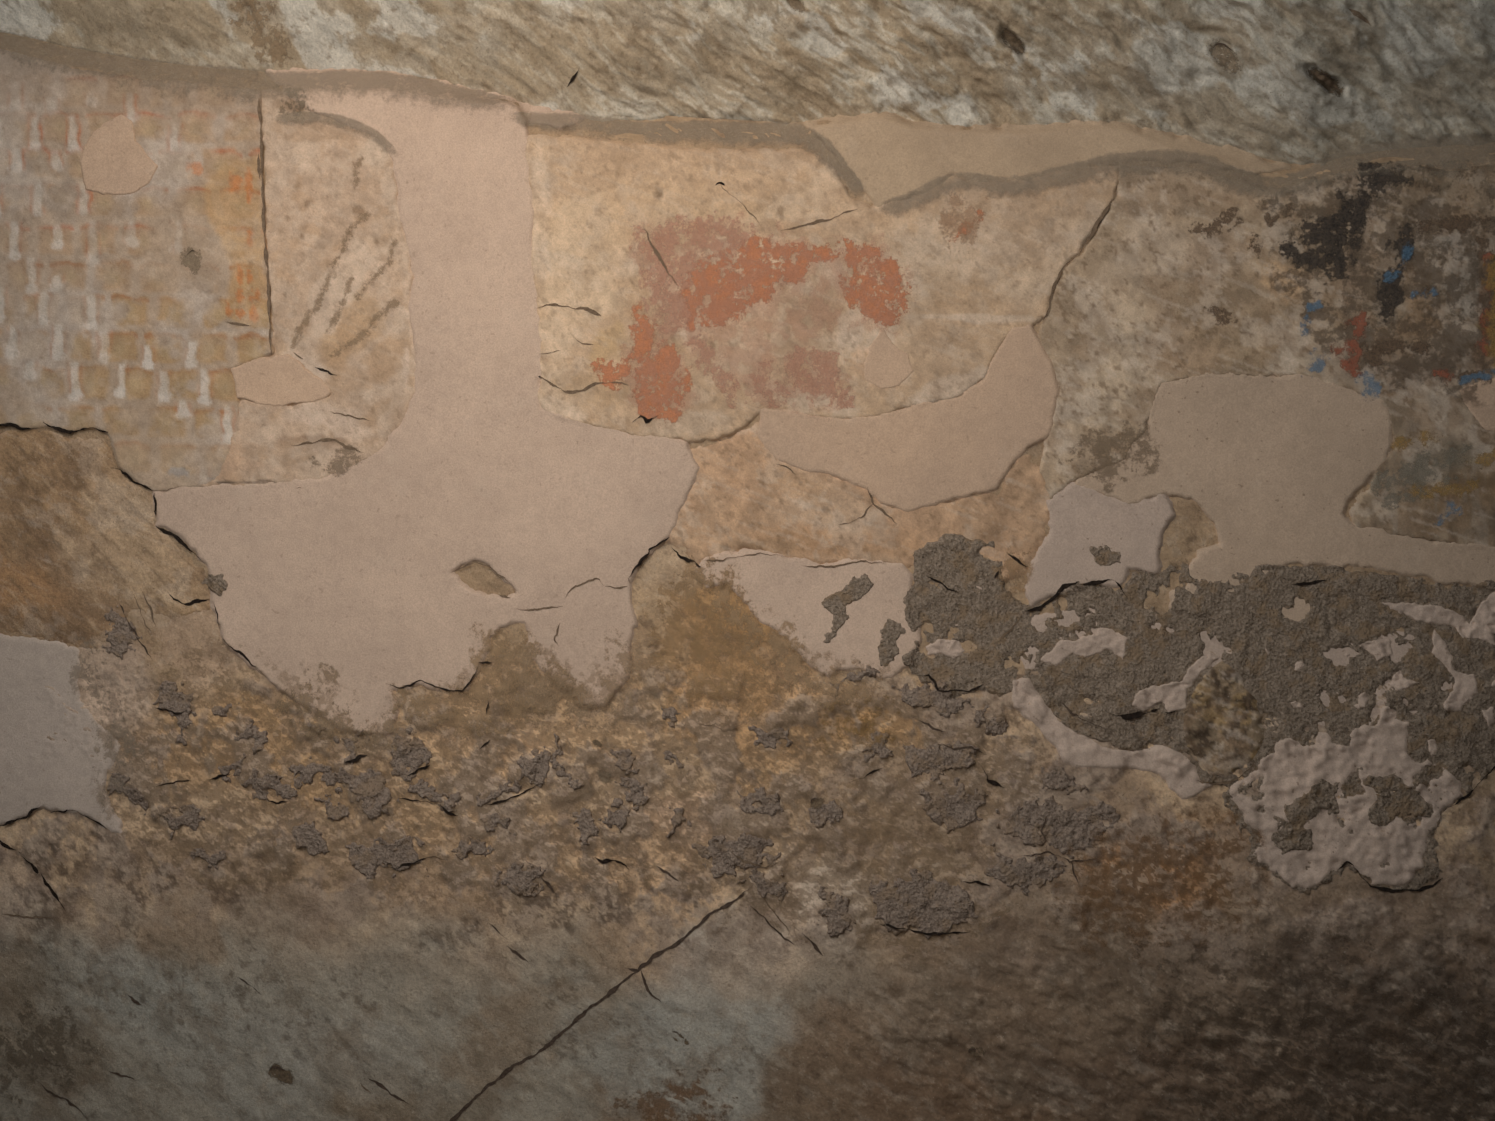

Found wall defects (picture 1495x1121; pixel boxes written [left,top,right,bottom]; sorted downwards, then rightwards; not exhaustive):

crack [0,422,108,434]
spalling [0,430,228,660]
crack [116,468,199,558]
crack [118,588,264,675]
spalling [660,422,1495,901]
crack [0,808,105,919]
spalling [103,772,231,870]
spalling [152,680,649,879]
spalling [494,862,548,897]
spalling [814,883,857,938]
spalling [868,869,983,940]
crack [450,850,823,1121]